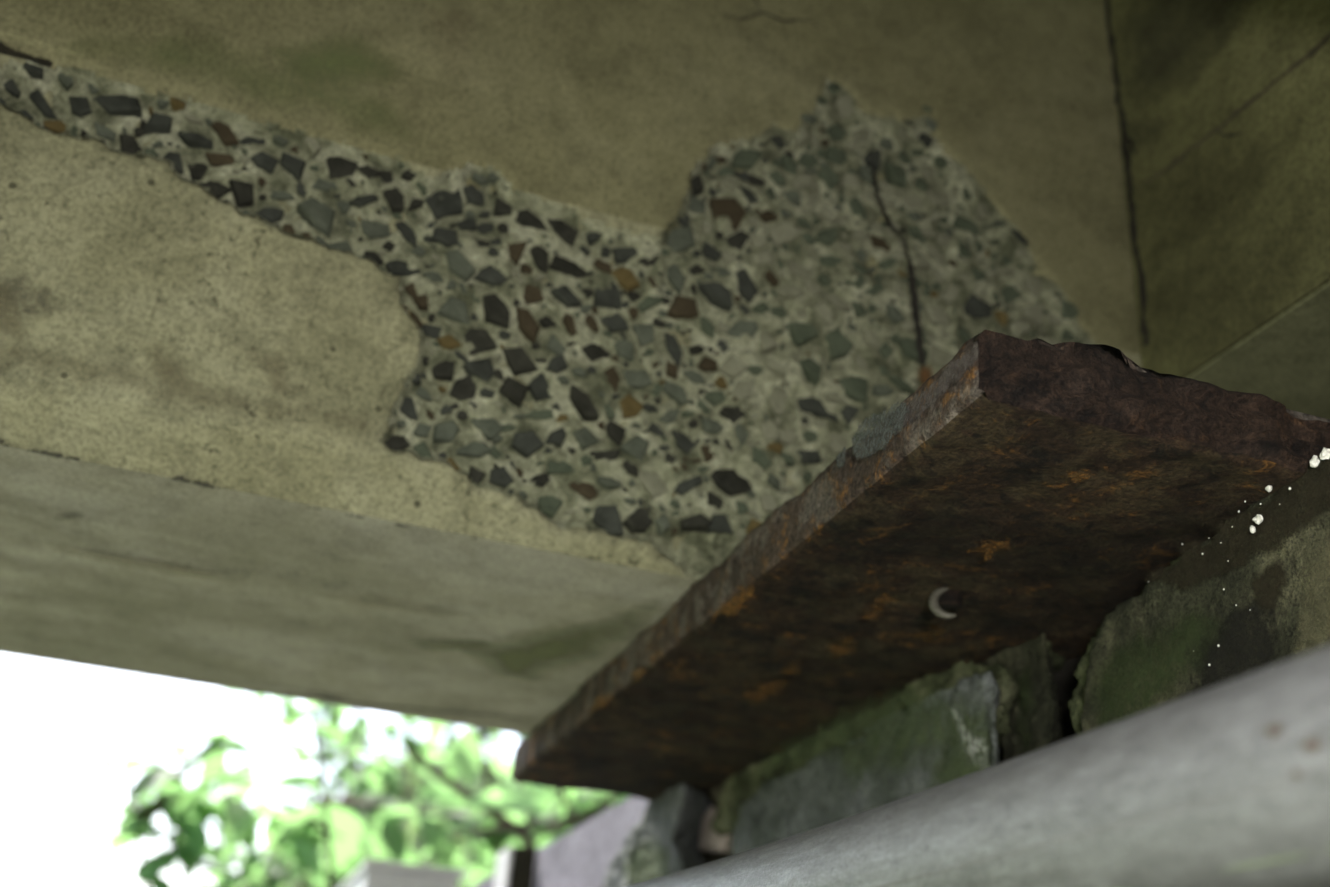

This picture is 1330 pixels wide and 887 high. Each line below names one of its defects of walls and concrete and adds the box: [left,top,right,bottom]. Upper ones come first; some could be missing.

spalling [0,59,1095,579]
crack [1104,0,1330,346]
leakage [1151,458,1330,694]